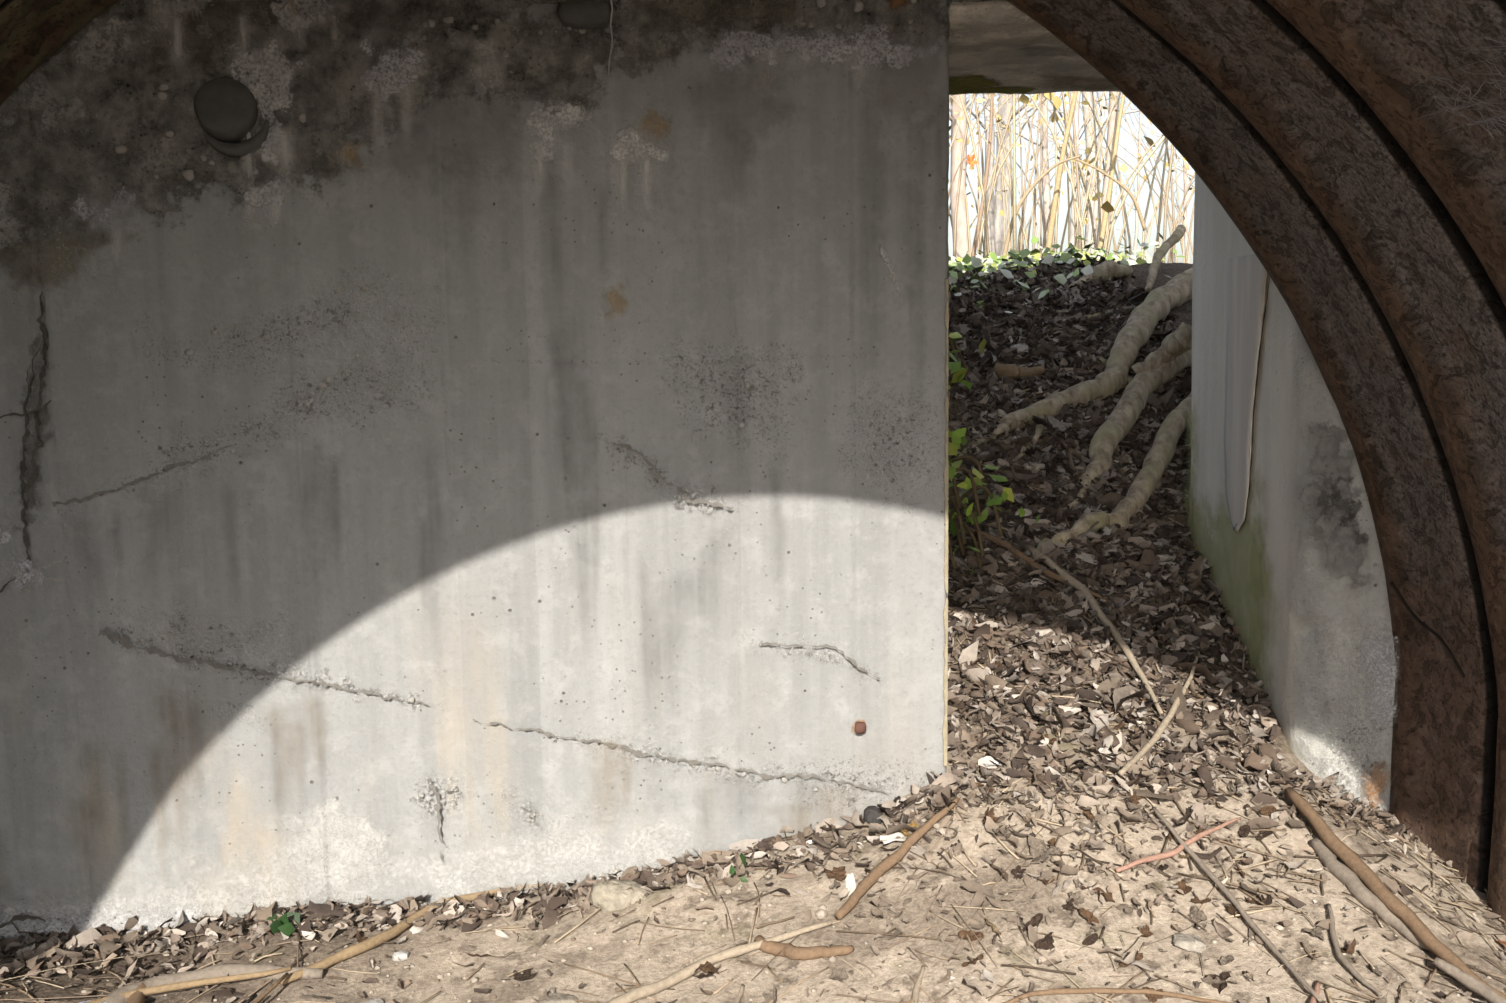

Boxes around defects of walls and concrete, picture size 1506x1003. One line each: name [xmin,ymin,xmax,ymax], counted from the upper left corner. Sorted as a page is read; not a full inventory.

water stain [142,0,335,207]
efflorescence [360,38,429,104]
efflorescence [526,100,592,163]
water stain [0,186,137,287]
crack [0,292,232,593]
crack [612,442,733,510]
crack [98,627,429,706]
crack [761,642,881,679]
crack [473,719,889,794]
rust [853,720,866,734]
rust [1366,762,1390,807]